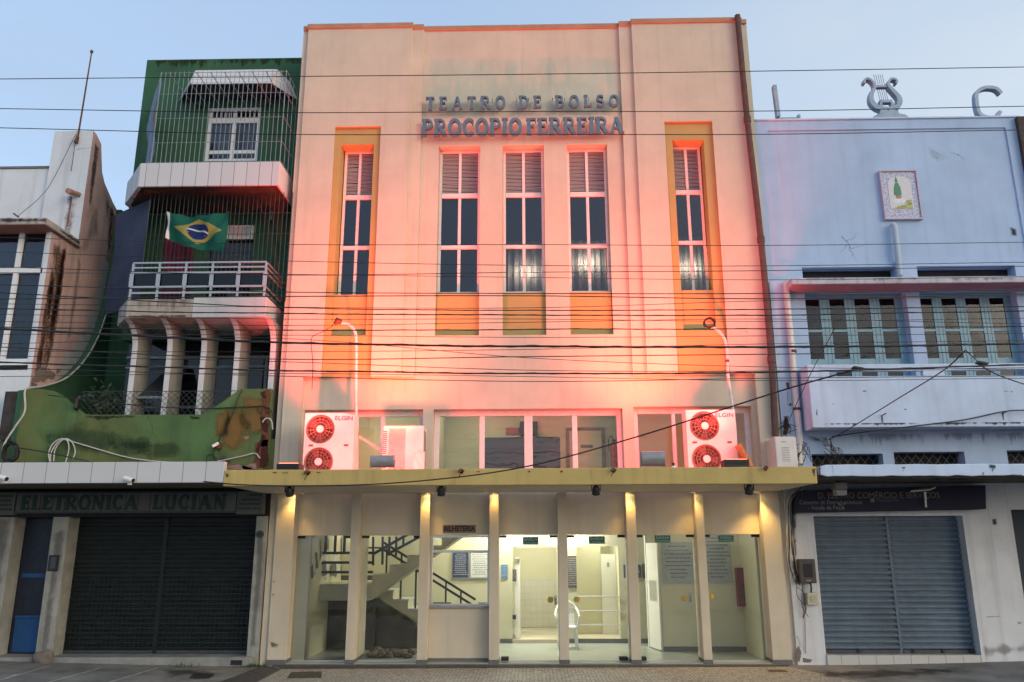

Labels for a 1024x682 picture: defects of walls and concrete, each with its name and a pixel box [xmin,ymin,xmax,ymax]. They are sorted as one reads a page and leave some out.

water stain [90,145,98,201]
water stain [37,230,80,370]
water stain [48,430,177,456]
peeling [216,390,288,473]